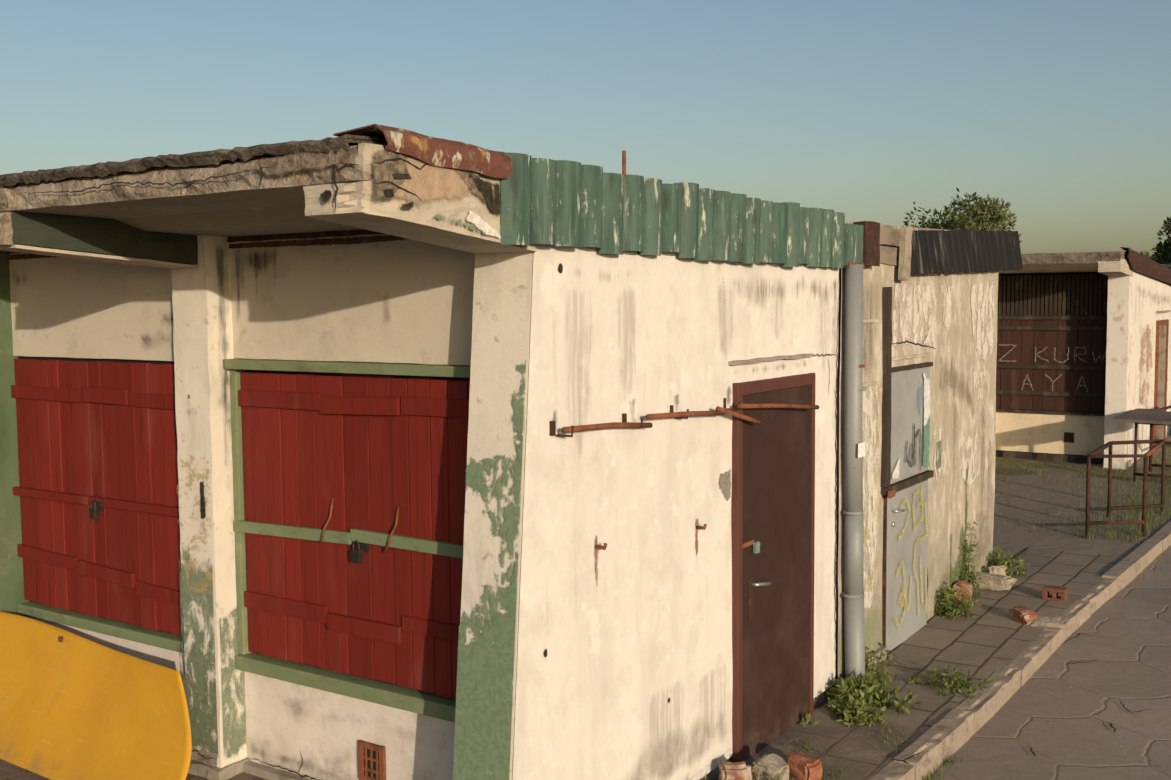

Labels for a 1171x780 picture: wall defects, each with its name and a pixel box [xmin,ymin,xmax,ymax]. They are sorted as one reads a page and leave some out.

leakage [217,249,270,286]
crack [333,151,358,212]
peeling [892,283,953,346]
peeling [934,278,995,503]
peeling [177,457,247,767]
peeling [453,364,526,780]